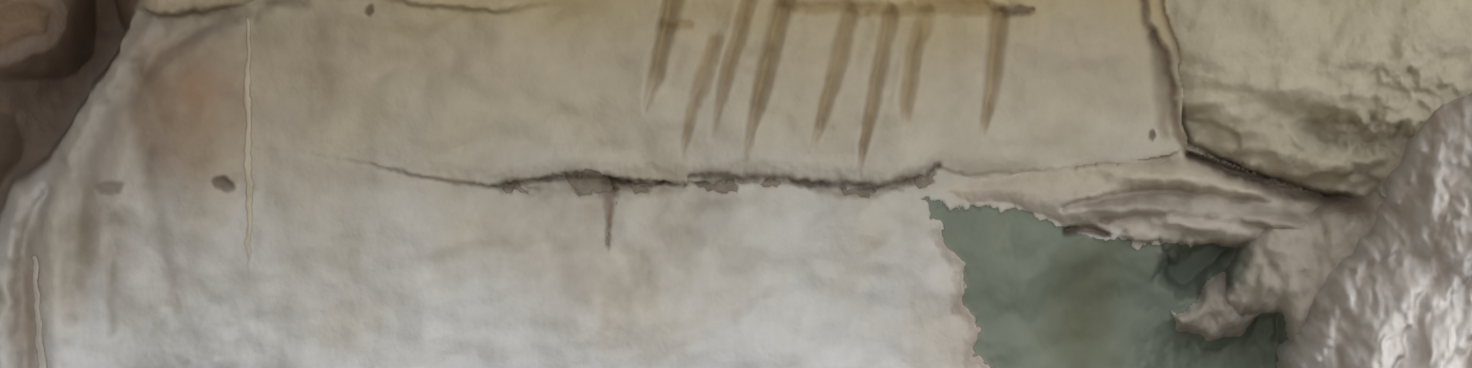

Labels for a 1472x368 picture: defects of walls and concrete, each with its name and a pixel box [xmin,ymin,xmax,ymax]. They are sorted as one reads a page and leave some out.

crack [504,166,936,198]
peeling [923,197,1288,368]